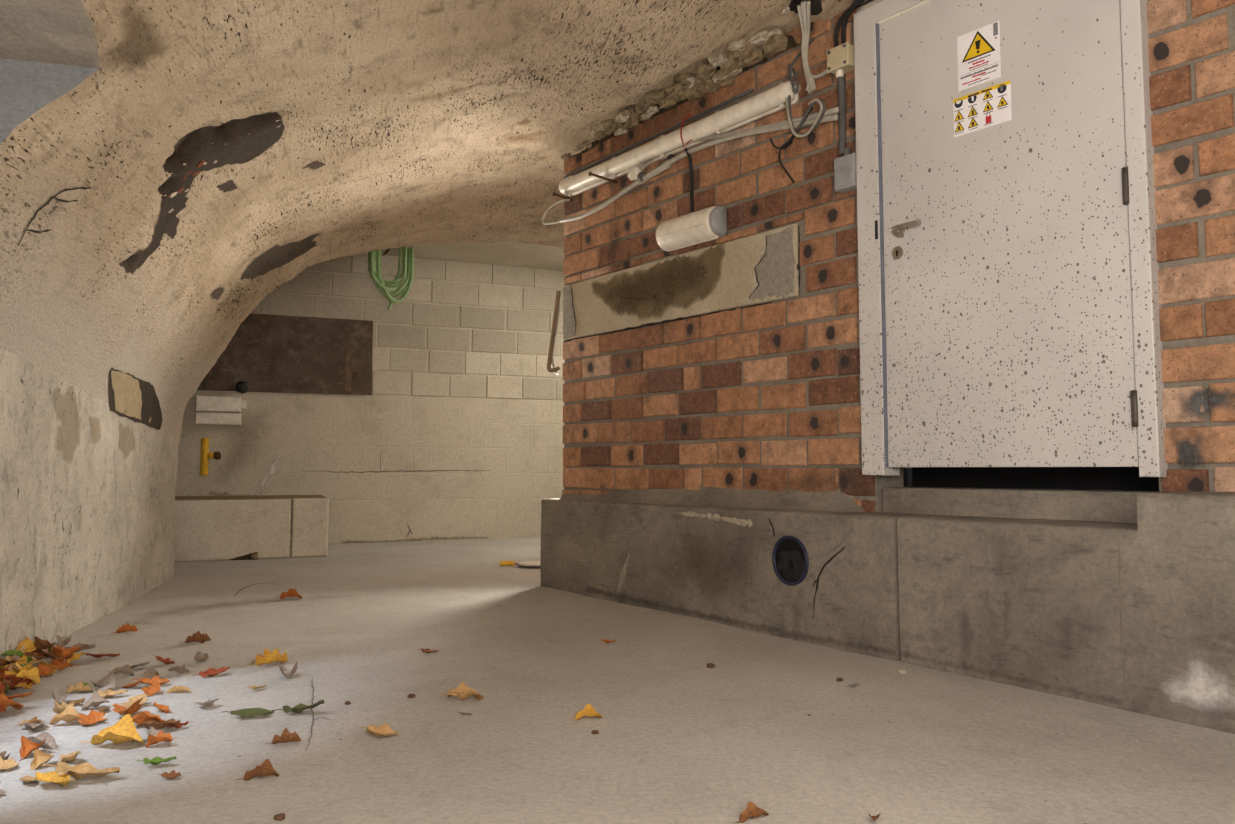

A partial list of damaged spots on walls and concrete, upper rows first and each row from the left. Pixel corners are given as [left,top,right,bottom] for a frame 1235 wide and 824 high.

water stain [592,245,724,318]
peeling [747,226,799,304]
crack [812,514,854,619]
water stain [1165,663,1232,707]